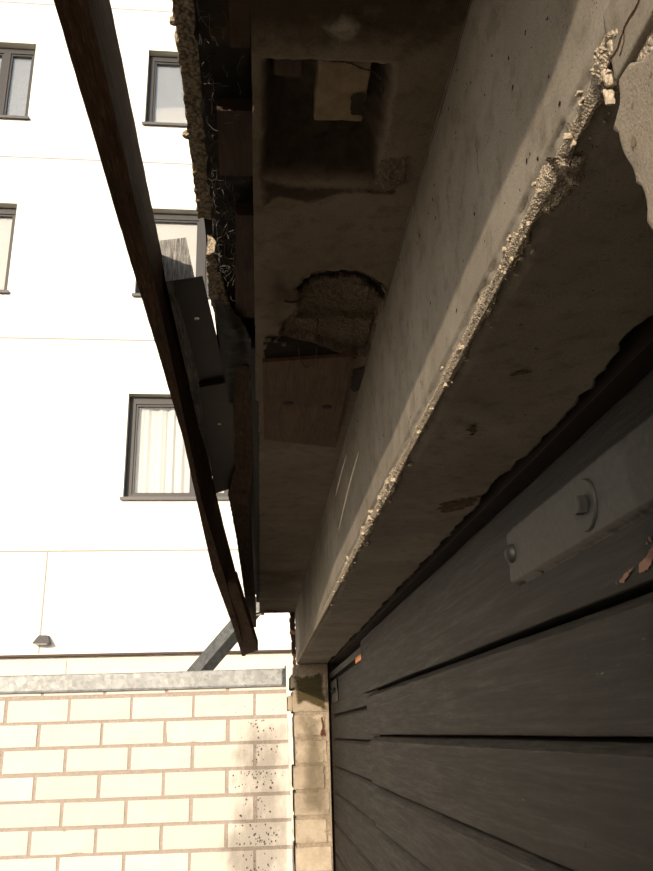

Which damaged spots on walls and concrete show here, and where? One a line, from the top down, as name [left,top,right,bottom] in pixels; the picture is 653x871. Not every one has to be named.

spalling [263,267,387,370]
spalling [296,29,620,664]
peeling [615,536,653,585]